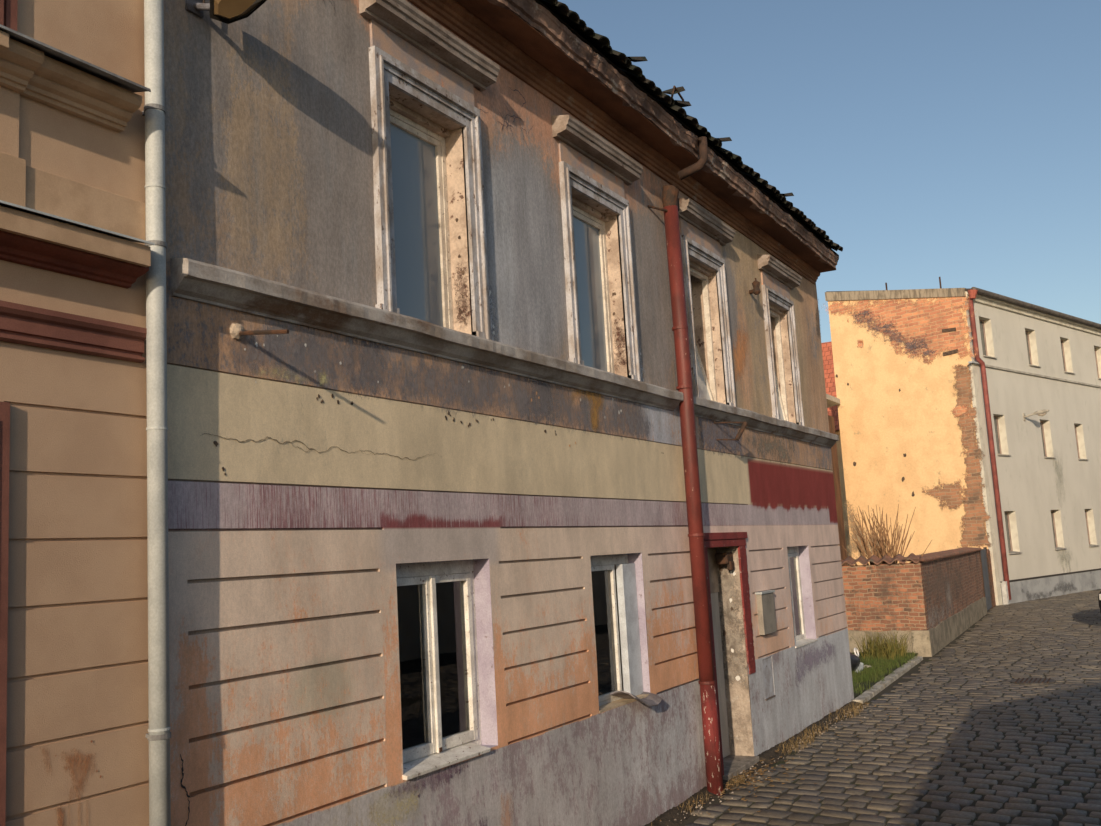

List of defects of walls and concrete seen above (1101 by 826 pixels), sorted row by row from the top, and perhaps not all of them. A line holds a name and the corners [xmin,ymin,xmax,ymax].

crack [202,433,437,460]
spalling [816,293,991,556]
crack [180,754,194,826]